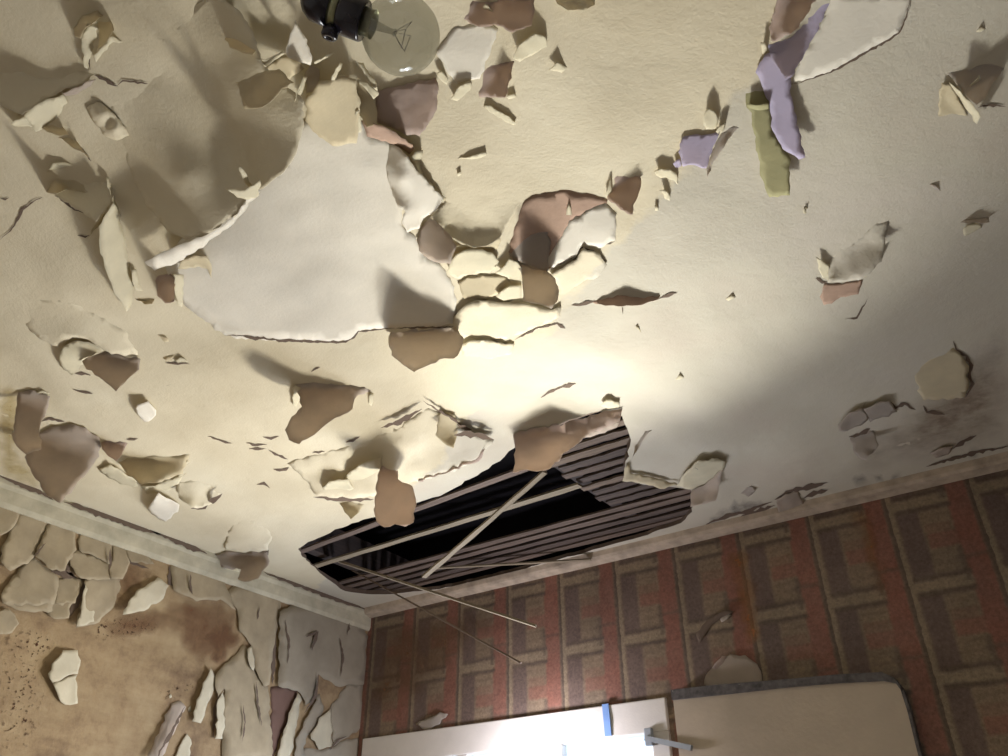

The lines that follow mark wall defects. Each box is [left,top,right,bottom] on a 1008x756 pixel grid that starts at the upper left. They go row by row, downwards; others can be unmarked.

peeling [0,11,122,161]
flaking render [47,0,641,372]
peeling [654,108,739,211]
flaking render [746,0,911,197]
peeling [816,221,889,320]
peeling [26,300,141,391]
peeling [12,390,222,522]
peeling [287,401,494,527]
peeling [513,399,622,473]
peeling [623,430,726,507]
peeling [838,341,977,460]
peeling [0,507,368,756]